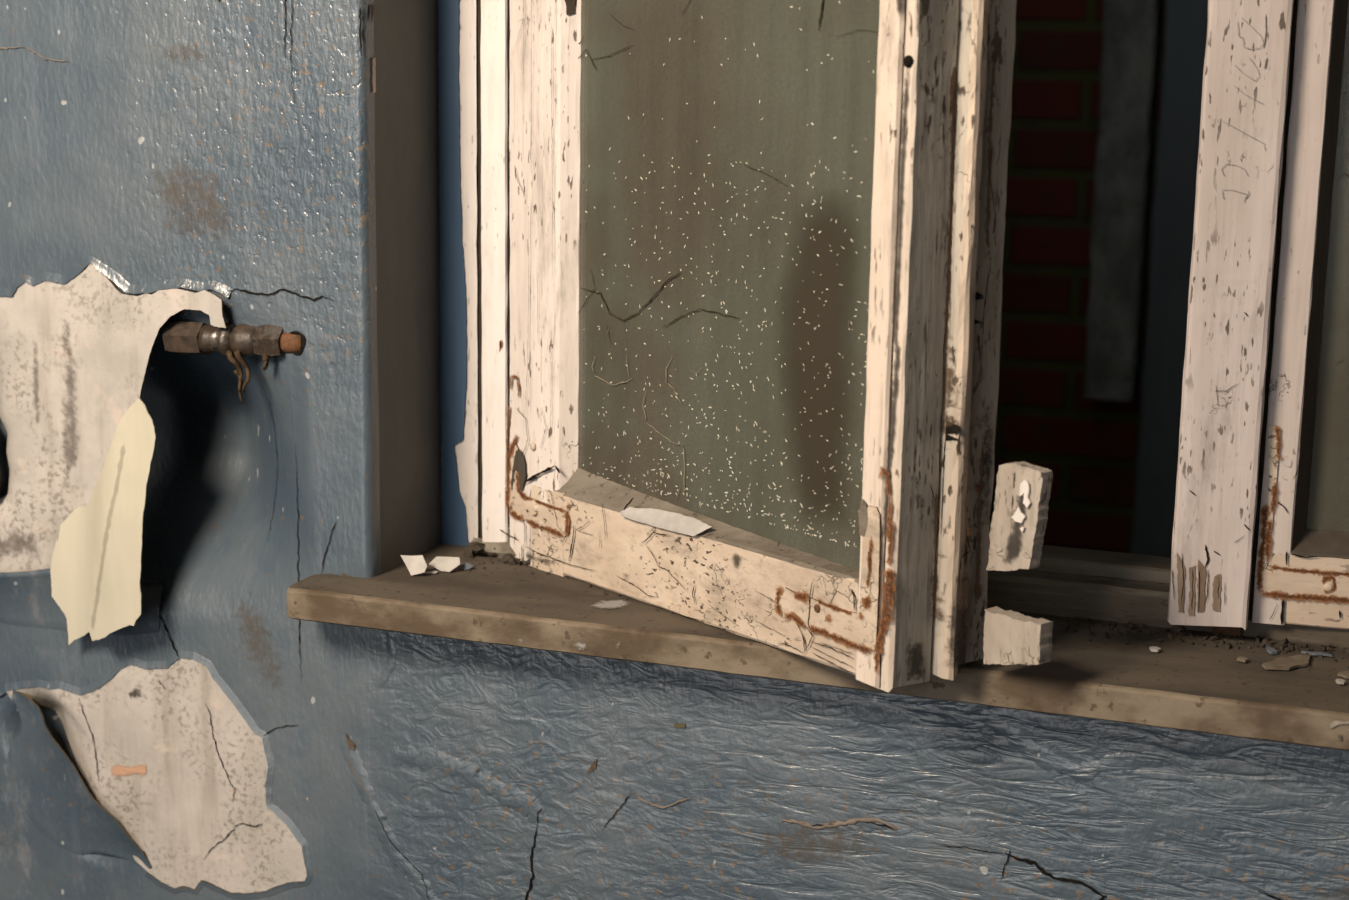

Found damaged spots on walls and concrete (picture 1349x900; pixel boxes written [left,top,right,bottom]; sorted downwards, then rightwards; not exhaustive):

crack [0,47,69,62]
crack [230,289,334,301]
peeling [0,256,233,645]
peeling [4,651,313,900]
crack [525,808,542,900]
crack [944,845,1118,900]